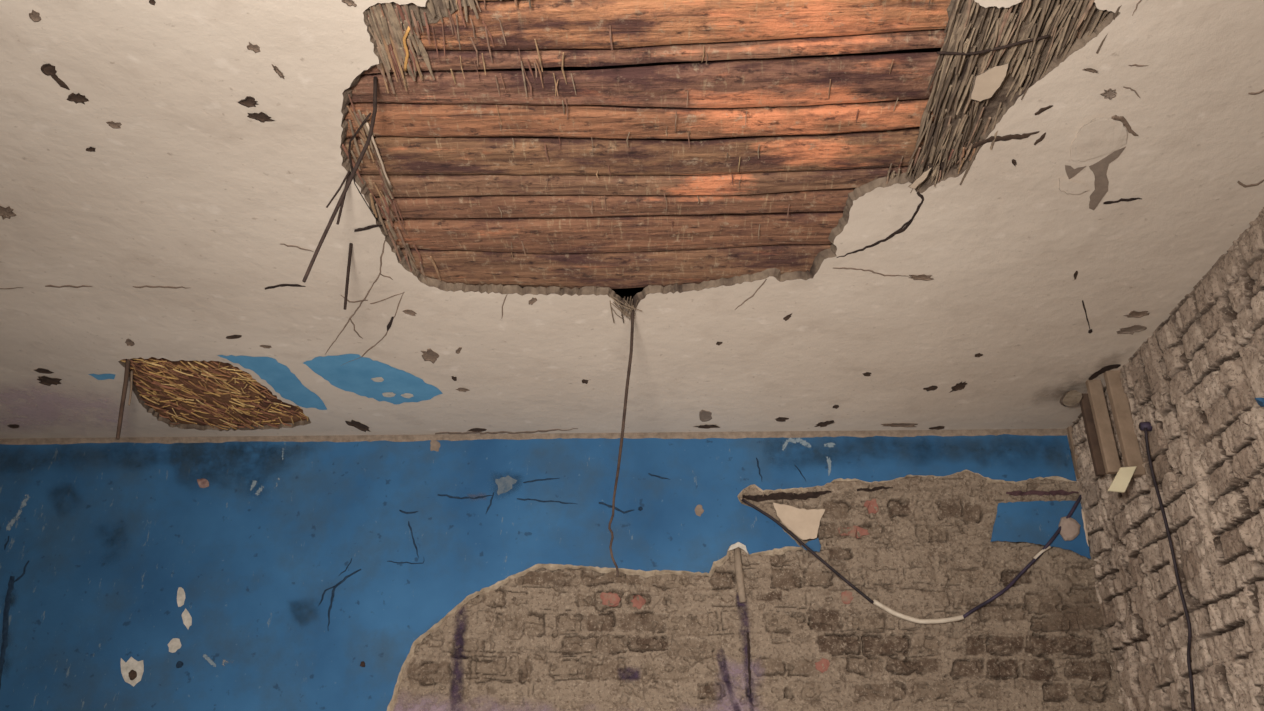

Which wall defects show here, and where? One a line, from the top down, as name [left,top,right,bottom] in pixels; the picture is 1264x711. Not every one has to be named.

flaking render [29,10,41,22]
flaking render [41,64,89,104]
flaking render [238,96,275,122]
flaking render [0,206,16,219]
spalling [340,0,1127,323]
crack [834,191,924,277]
crack [1237,180,1264,188]
crack [326,225,404,366]
flaking render [168,587,192,668]
crack [318,478,633,631]
flaking render [387,469,1125,711]
flaking render [120,657,144,687]